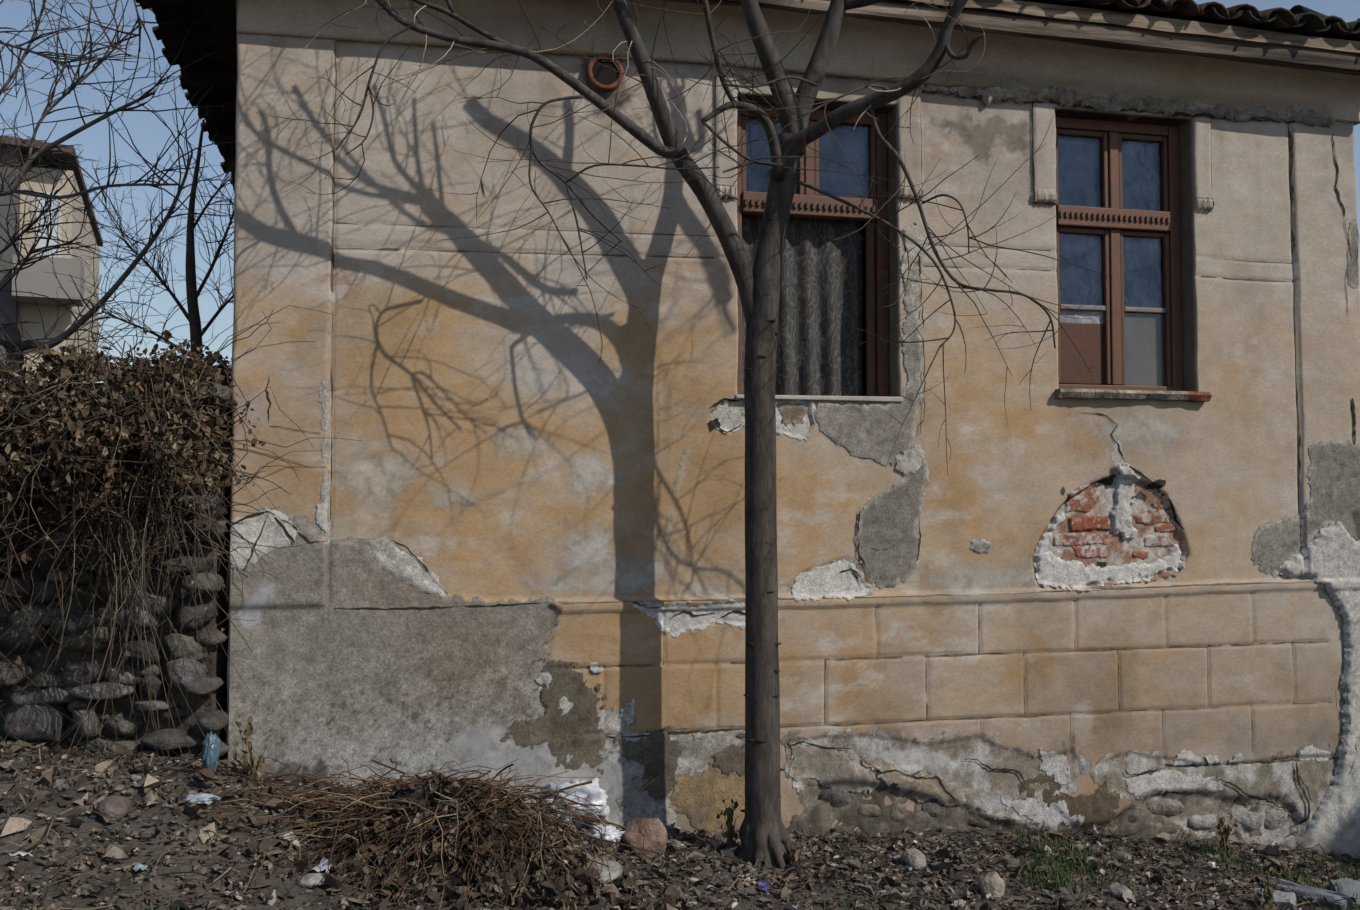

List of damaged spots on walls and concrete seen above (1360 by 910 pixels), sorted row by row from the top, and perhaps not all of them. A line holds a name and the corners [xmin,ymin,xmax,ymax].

crack [922,91,1302,123]
crack [1332,133,1352,314]
flaking render [709,396,745,434]
crack [1080,412,1184,530]
flaking render [230,507,299,571]
flaking render [369,536,448,598]
flaking render [632,598,745,637]
flaking render [791,556,874,602]
spalling [1033,462,1189,592]
flaking render [669,723,745,832]
flaking render [781,722,1339,848]
crack [1125,757,1338,836]